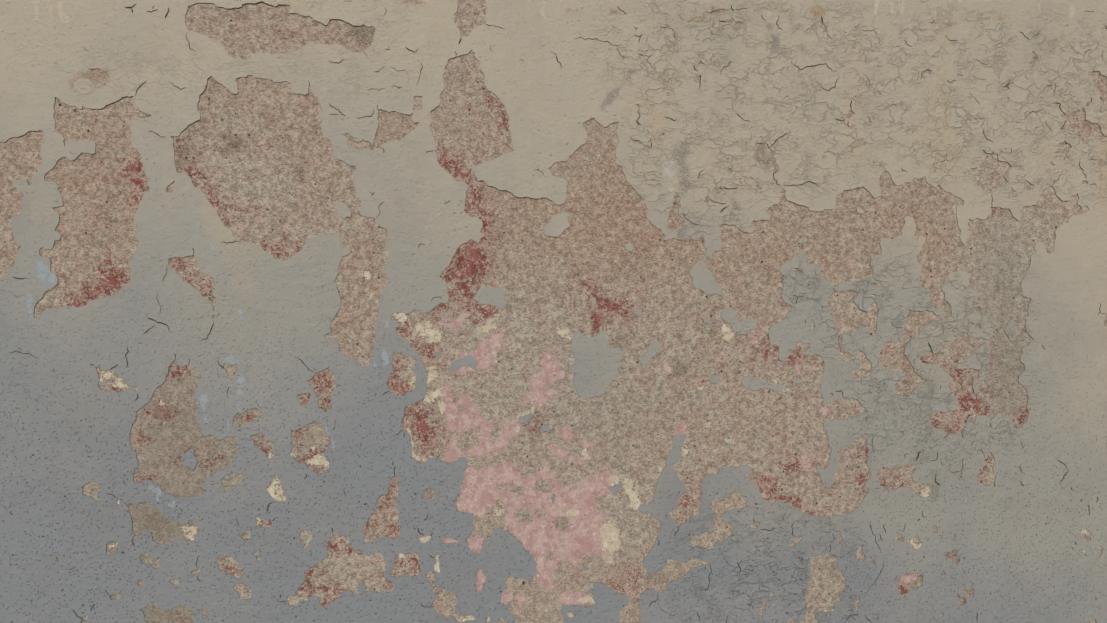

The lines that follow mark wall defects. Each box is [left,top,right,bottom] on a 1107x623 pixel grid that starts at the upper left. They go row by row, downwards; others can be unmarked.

peeling [185,2,376,60]
peeling [454,0,487,37]
crack [708,6,781,29]
crack [796,63,896,127]
crack [1004,75,1067,130]
peeling [0,96,151,317]
crack [683,133,819,226]
peeling [167,50,1089,623]
peeling [96,367,138,393]
peeling [129,360,274,497]